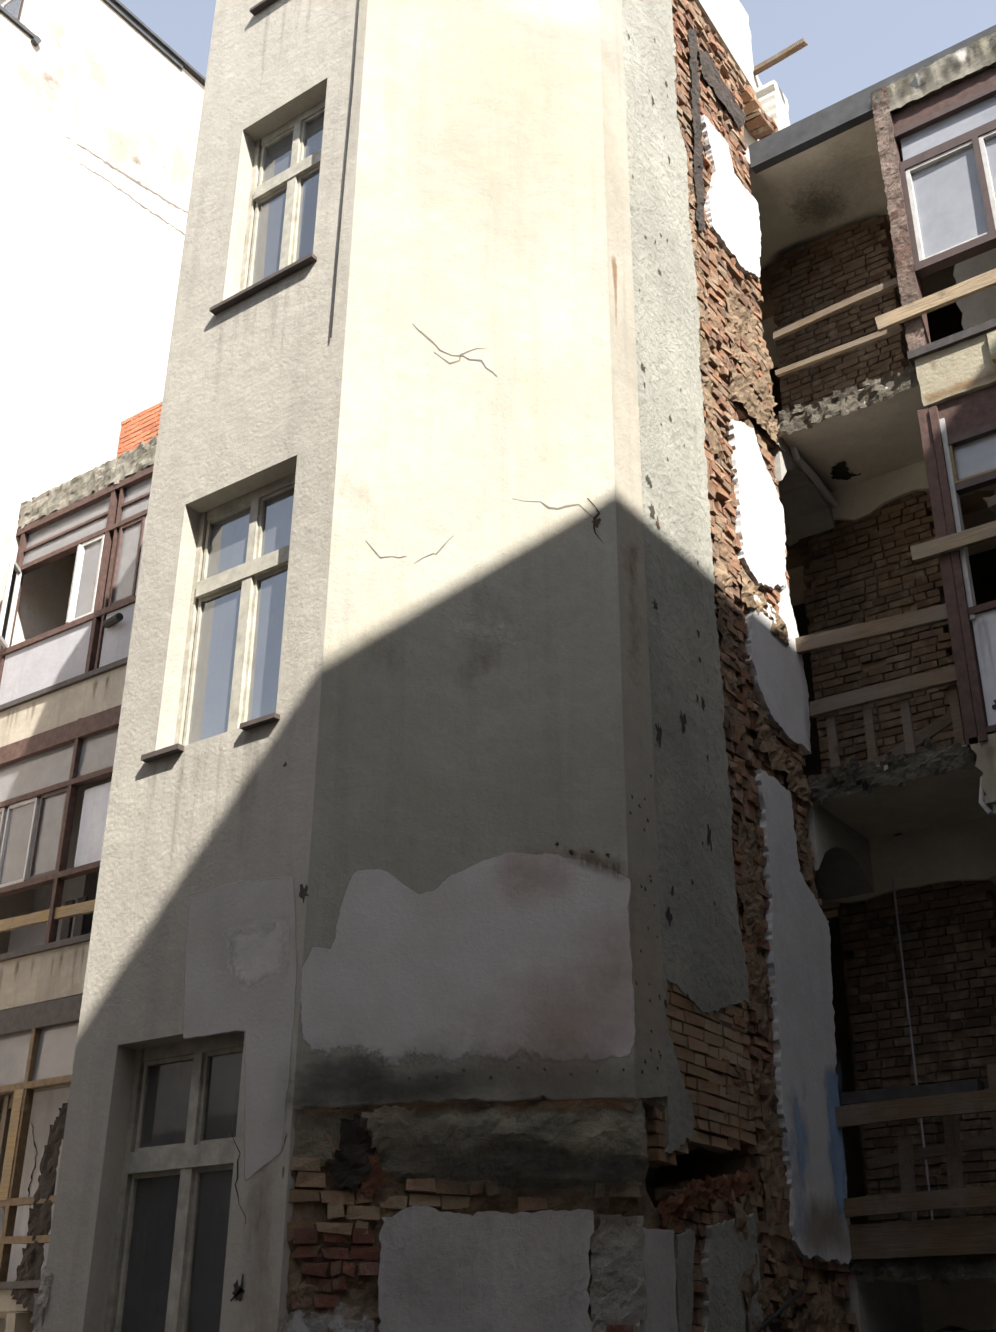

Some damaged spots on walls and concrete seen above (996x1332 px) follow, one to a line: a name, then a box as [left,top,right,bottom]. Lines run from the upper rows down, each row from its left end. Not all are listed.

crack [413,324,497,376]
crack [512,498,604,544]
crack [366,534,455,563]
flaking render [285,0,861,1332]
spalling [979,776,996,816]
crack [27,1124,38,1208]